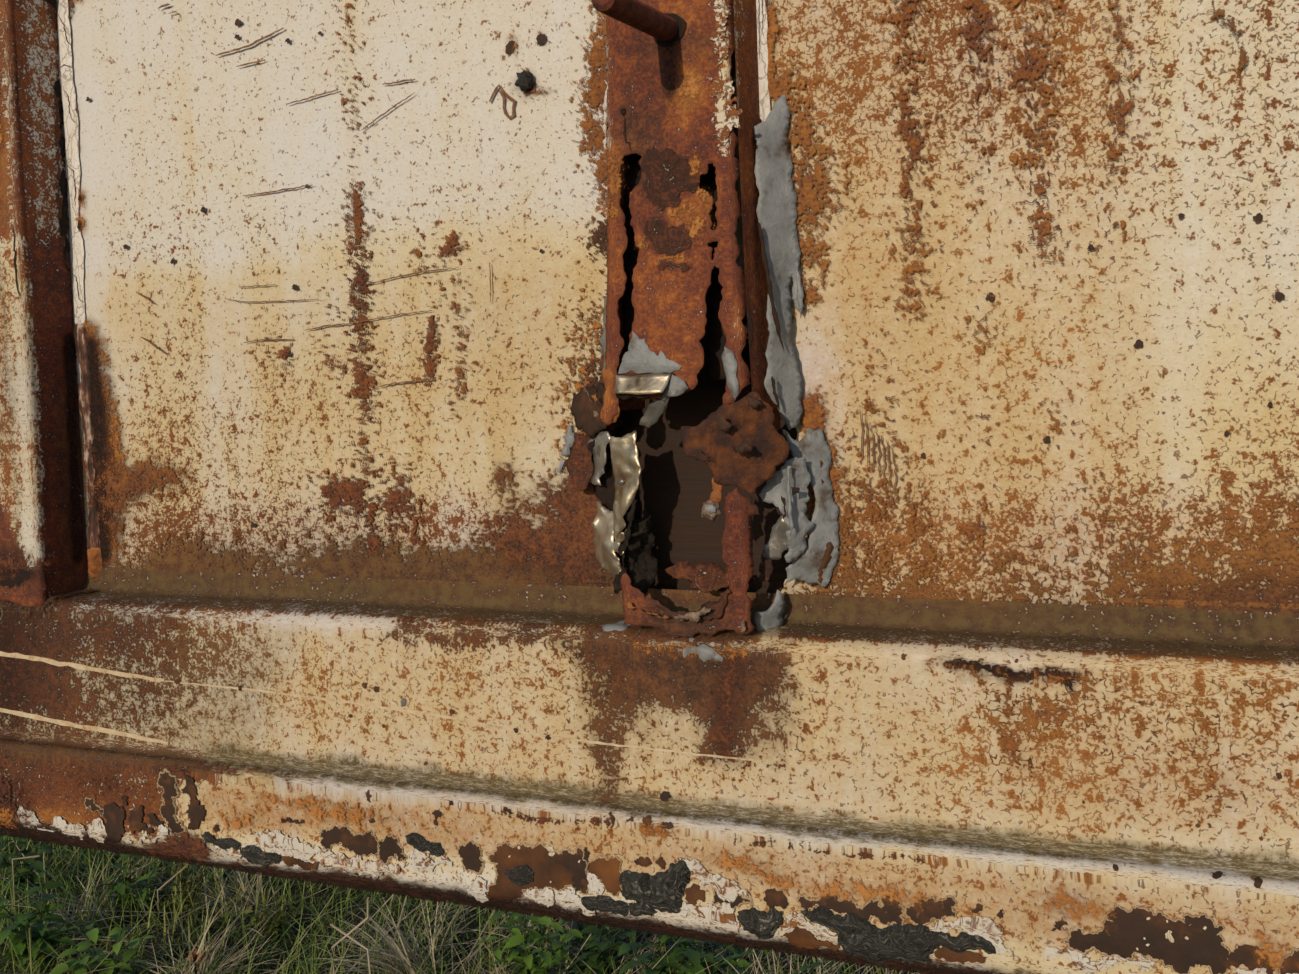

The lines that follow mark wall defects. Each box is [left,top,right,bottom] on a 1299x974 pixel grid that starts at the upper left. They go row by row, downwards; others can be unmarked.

rust [951,0,1141,298]
rust [304,0,430,556]
rust [472,0,727,587]
peeling [722,347,739,400]
peeling [754,590,785,631]
rust [0,589,195,834]
peeling [17,761,340,844]
peeling [209,847,242,862]
rust [379,588,805,805]
peeling [250,790,1018,958]
rust [972,660,1299,828]
peeling [1043,905,1299,974]